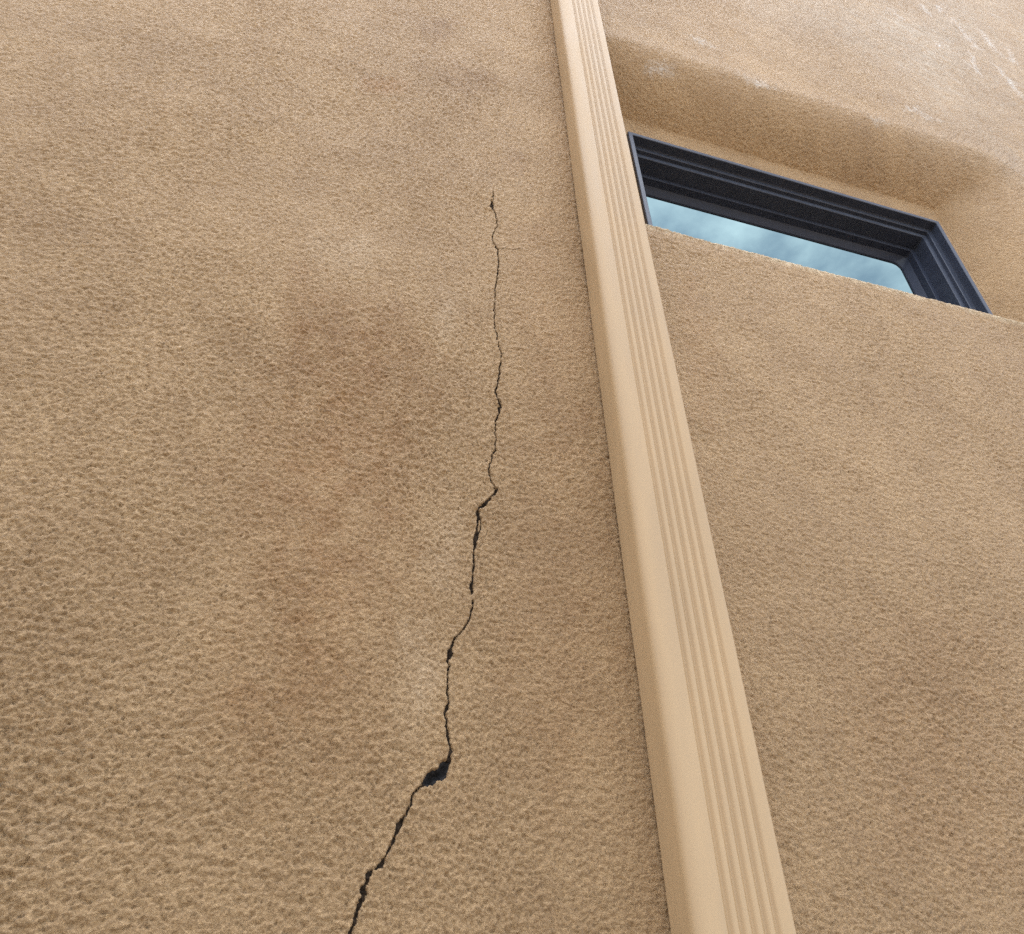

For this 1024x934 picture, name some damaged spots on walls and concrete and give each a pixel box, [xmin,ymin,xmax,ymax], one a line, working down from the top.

crack [348,193,502,934]